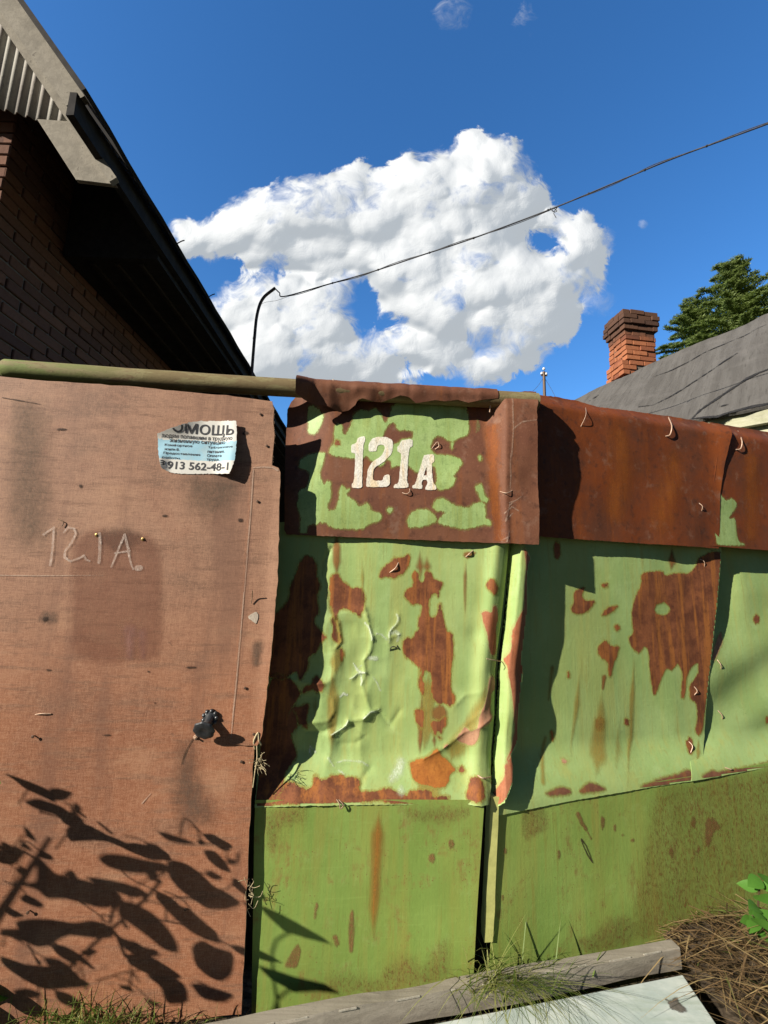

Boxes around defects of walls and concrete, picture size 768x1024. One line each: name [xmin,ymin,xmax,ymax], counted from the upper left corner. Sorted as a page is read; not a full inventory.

rust [255,538,530,846]
rust [571,551,723,756]
rust [372,824,381,920]